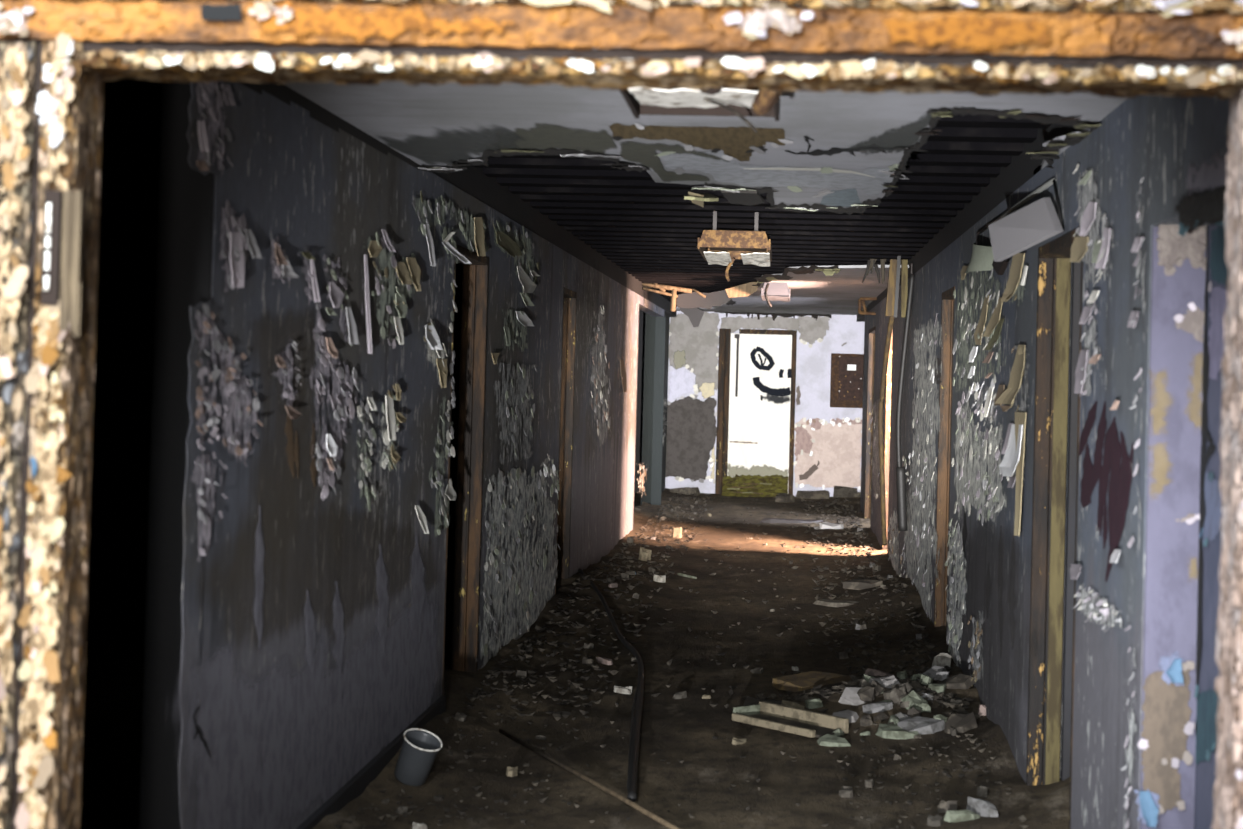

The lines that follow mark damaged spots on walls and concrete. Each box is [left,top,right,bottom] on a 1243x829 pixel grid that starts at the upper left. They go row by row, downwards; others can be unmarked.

rust [245,0,514,42]
spalling [609,123,908,208]
peeling [1070,164,1229,397]
peeling [190,303,264,562]
peeling [218,191,560,668]
spalling [663,308,830,484]
spalling [794,386,881,516]
peeling [887,253,1030,682]
peeling [1070,564,1131,632]
peeling [1109,536,1134,563]
peeling [1110,366,1144,517]
spalling [1121,647,1219,829]